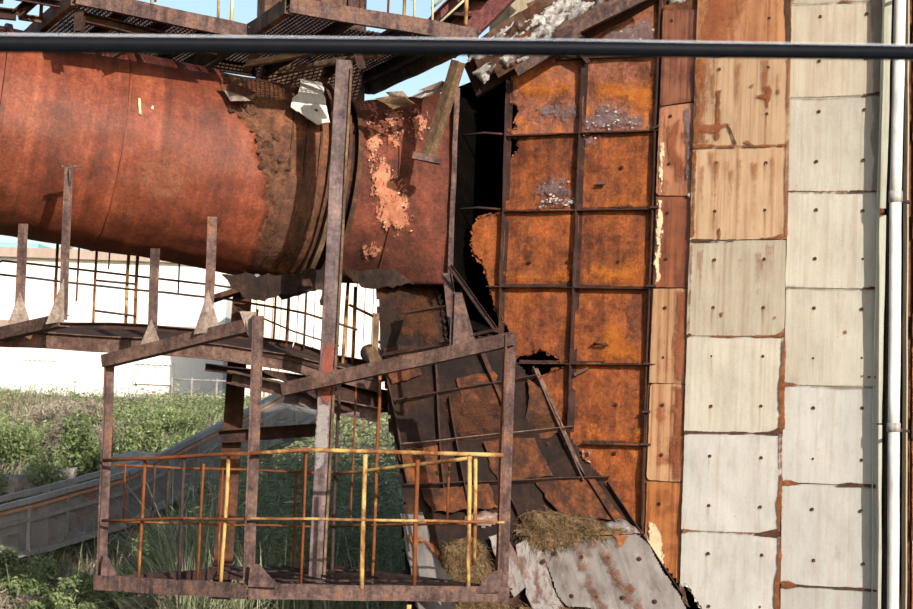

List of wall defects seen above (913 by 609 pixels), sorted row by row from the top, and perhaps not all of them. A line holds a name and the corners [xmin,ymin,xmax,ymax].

corrosion [701,0,744,42]
peeling [366,106,431,237]
peeling [360,241,382,259]
peeling [469,211,501,300]
peeling [515,348,569,379]
corrosion [583,58,877,609]
corrosion [569,534,643,609]